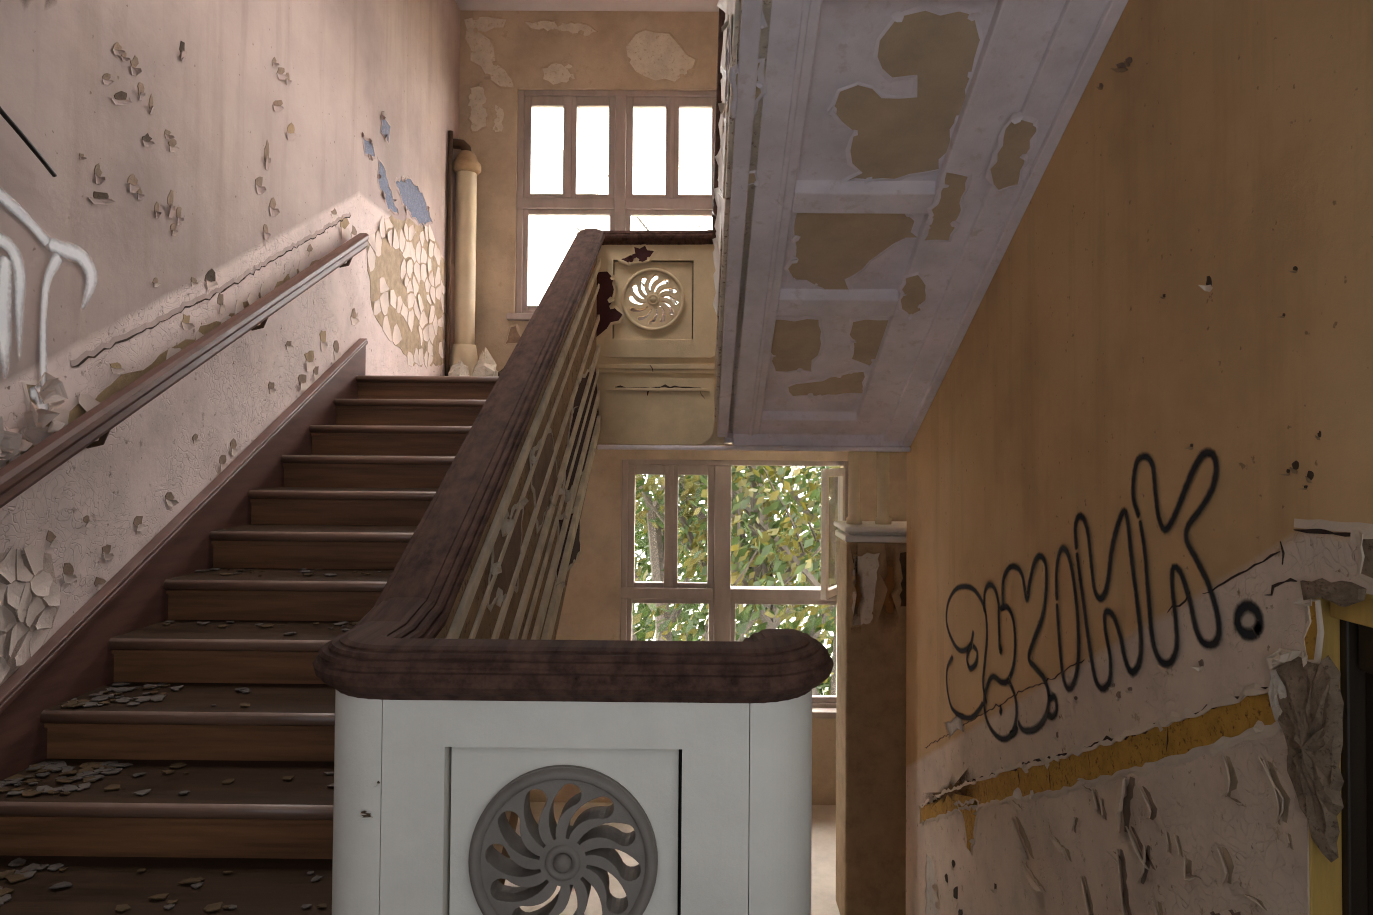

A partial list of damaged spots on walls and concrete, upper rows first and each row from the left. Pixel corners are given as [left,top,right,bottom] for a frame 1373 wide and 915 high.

spalling [102,42,155,115]
spalling [0,244,318,472]
crack [70,212,351,367]
spalling [255,140,280,240]
spalling [285,330,341,390]
peeling [331,111,446,368]
peeling [624,29,698,83]
peeling [712,0,739,324]
peeling [769,272,929,399]
peeling [784,3,1040,290]
peeling [0,530,106,686]
spalling [918,529,1373,915]